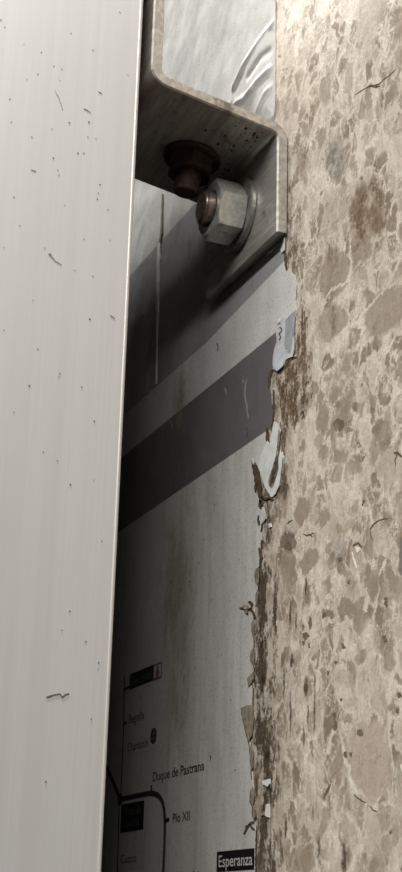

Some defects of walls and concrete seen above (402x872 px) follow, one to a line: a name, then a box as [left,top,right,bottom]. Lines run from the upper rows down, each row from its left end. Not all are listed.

peeling [252,310,297,497]
peeling [241,566,260,820]